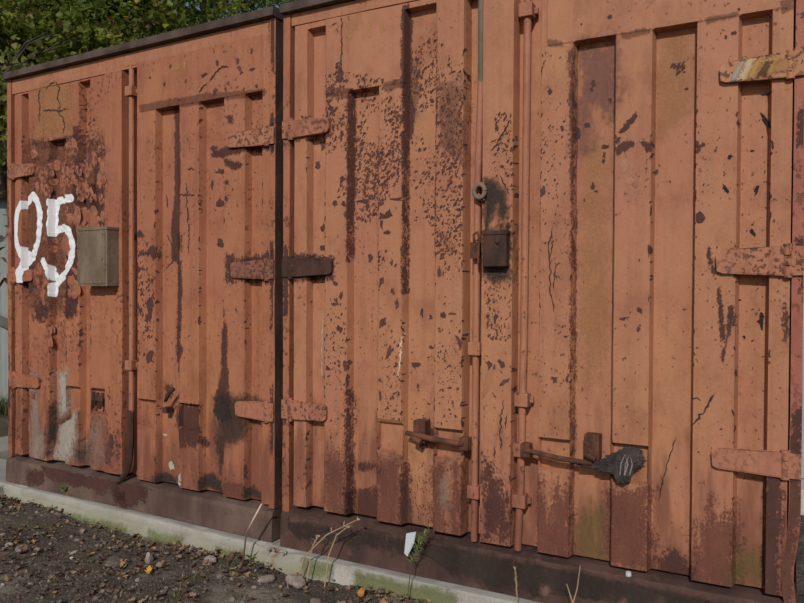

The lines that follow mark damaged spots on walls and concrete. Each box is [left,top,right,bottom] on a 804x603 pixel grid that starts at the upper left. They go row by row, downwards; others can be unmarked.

peeling [21,100,105,199]
rust [210,143,274,190]
rust [332,92,369,263]
rust [372,4,415,295]
water stain [53,371,77,461]
rust [139,106,183,372]
rust [163,383,210,449]
rust [213,323,230,416]
rust [217,238,335,330]
rust [568,48,590,457]
rust [717,288,736,362]
rust [480,450,516,544]